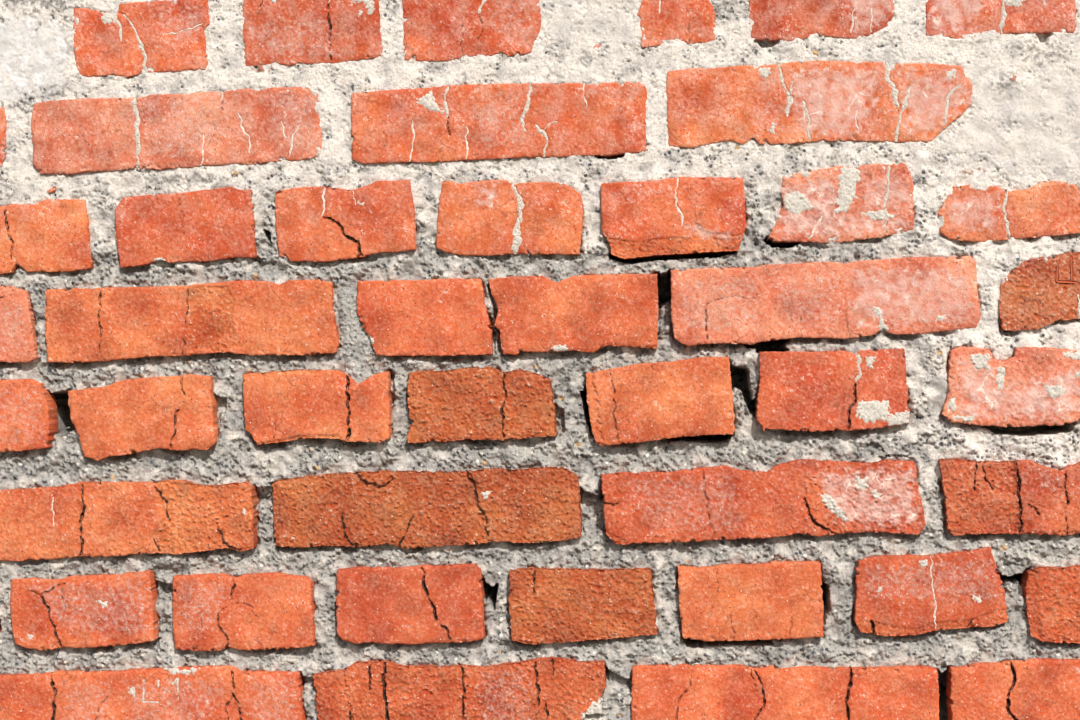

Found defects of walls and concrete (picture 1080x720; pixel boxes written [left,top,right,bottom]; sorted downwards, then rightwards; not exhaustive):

crack [443,86,469,159]
crack [520,83,558,157]
crack [321,188,362,255]
crack [511,184,525,254]
crack [1016,463,1040,532]
crack [31,586,66,646]
crack [421,568,451,639]
crack [50,672,58,720]
crack [368,663,389,720]
crack [535,659,555,719]
crack [845,666,853,718]
crack [1006,662,1017,720]